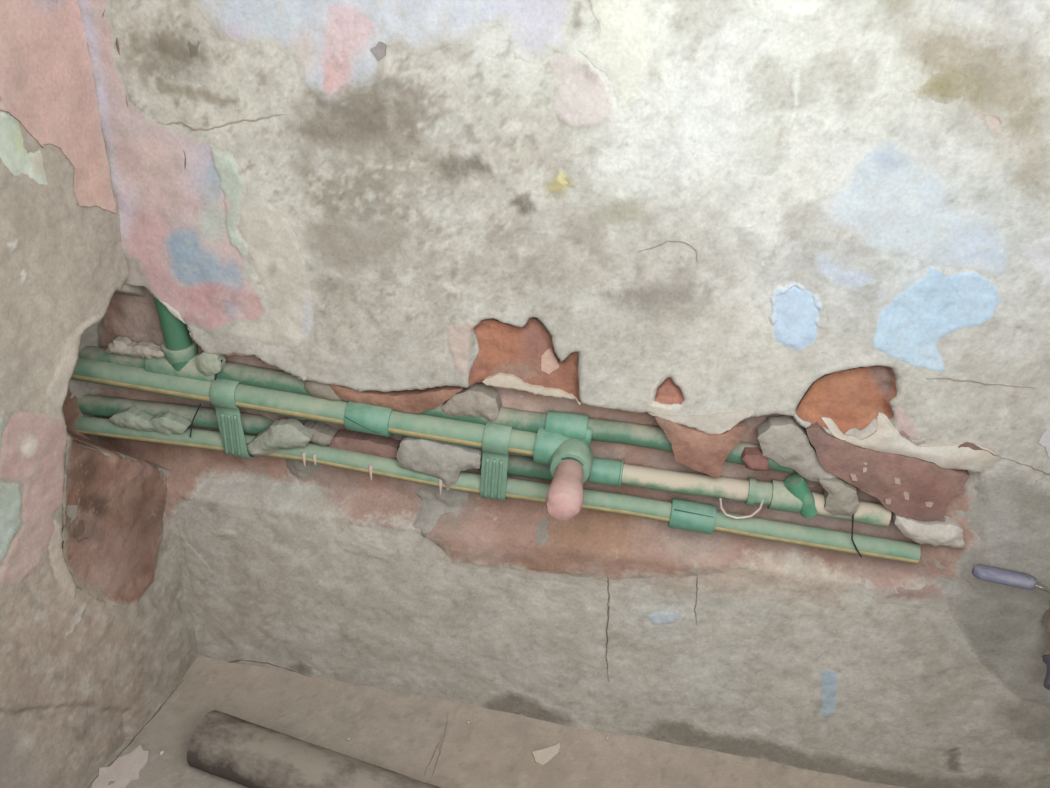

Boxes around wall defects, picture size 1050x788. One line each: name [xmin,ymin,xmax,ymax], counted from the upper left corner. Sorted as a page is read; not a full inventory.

water stain [277,93,501,188]
water stain [506,168,577,218]
water stain [294,206,418,288]
spalling [0,0,999,609]
crack [603,576,611,683]